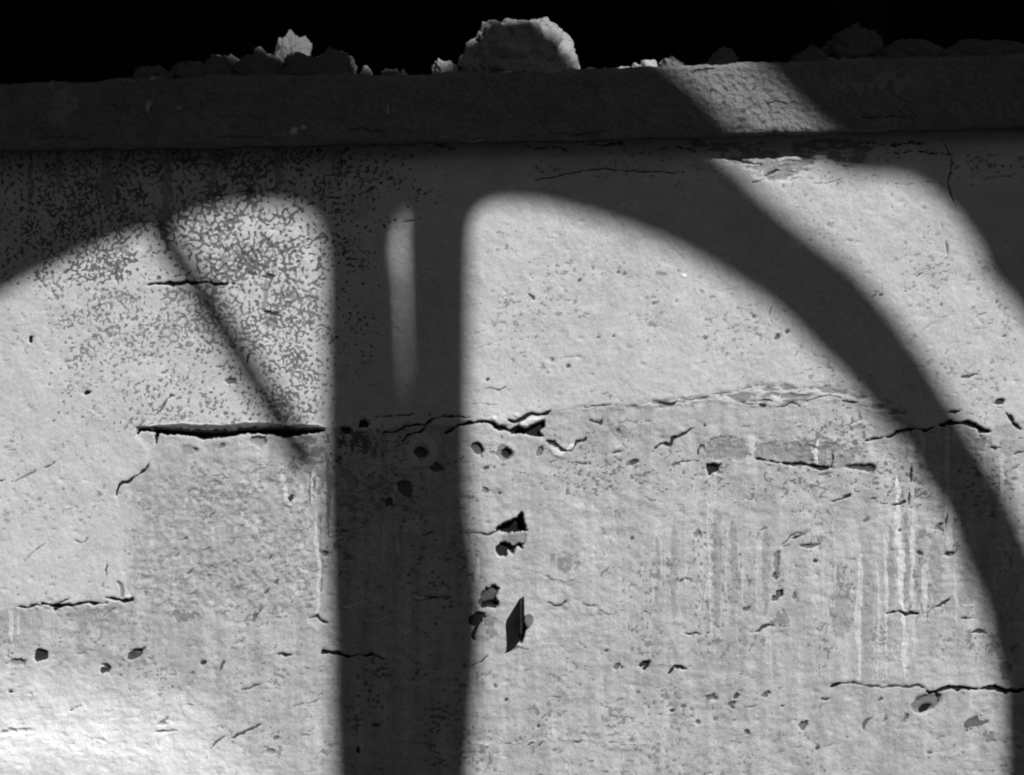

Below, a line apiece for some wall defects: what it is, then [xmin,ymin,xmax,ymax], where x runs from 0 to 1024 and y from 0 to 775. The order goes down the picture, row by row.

crack [97,464,149,496]
crack [374,384,861,491]
crack [715,410,1024,506]
crack [18,563,203,620]
spalling [502,532,527,544]
spalling [524,614,534,628]
leakage [653,502,688,625]
leakage [699,501,790,680]
leakage [820,421,979,681]
crack [277,649,386,737]
crack [820,681,1024,708]